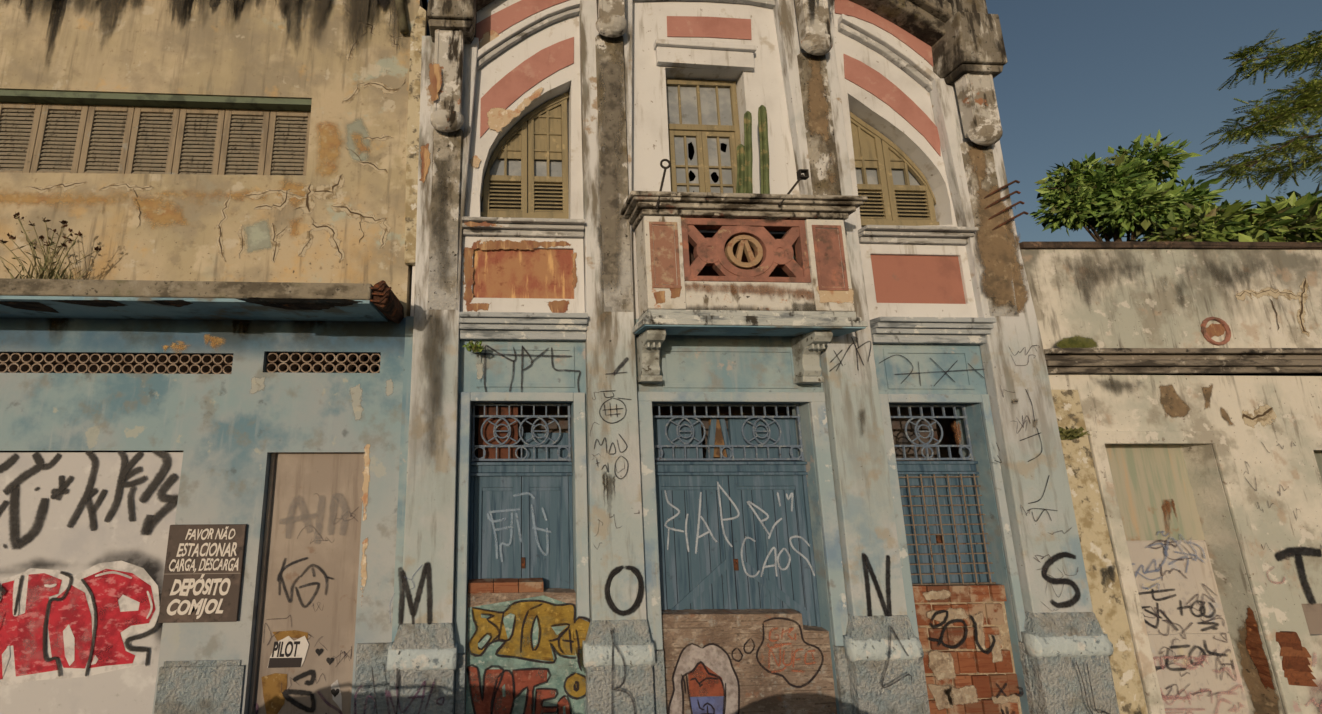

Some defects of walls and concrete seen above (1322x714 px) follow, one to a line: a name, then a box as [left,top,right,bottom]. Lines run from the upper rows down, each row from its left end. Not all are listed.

leakage [21,0,120,55]
leakage [172,0,260,21]
leakage [278,0,407,38]
crack [342,3,406,103]
crack [216,135,392,263]
peeling [968,145,1028,313]
spalling [0,300,129,313]
spalling [234,297,362,310]
leakage [423,316,445,450]
spalling [1160,385,1233,425]
leakage [603,473,615,494]
spalling [1237,607,1318,714]